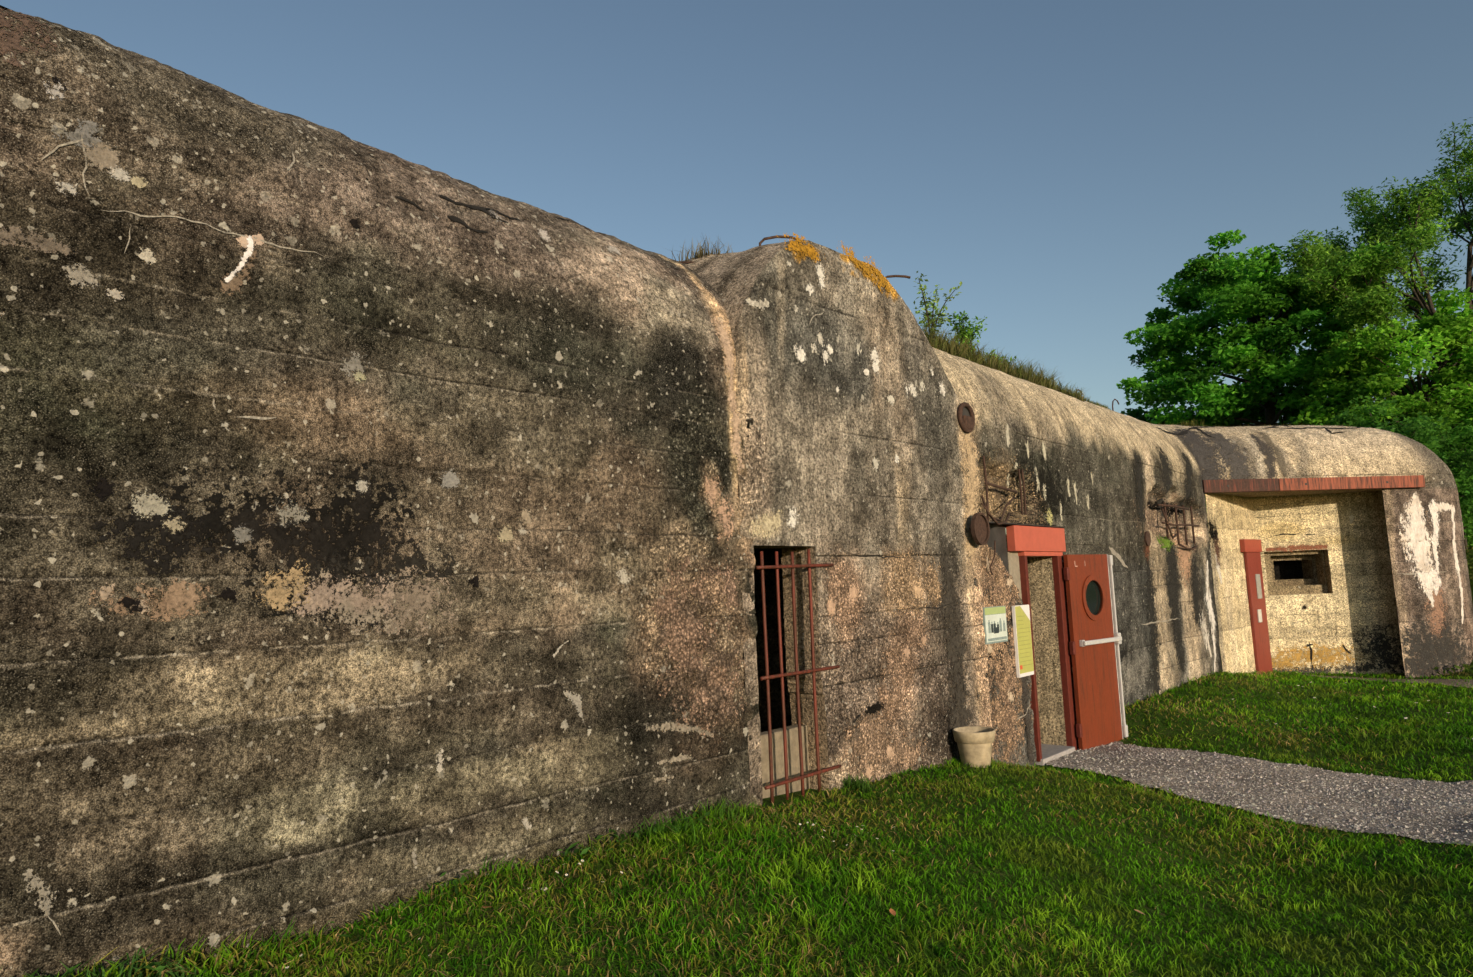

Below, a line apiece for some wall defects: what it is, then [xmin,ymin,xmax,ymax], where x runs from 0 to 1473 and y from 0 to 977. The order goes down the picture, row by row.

crack [42,118,325,257]
mould [91,454,472,631]
peeling [1399,493,1464,624]